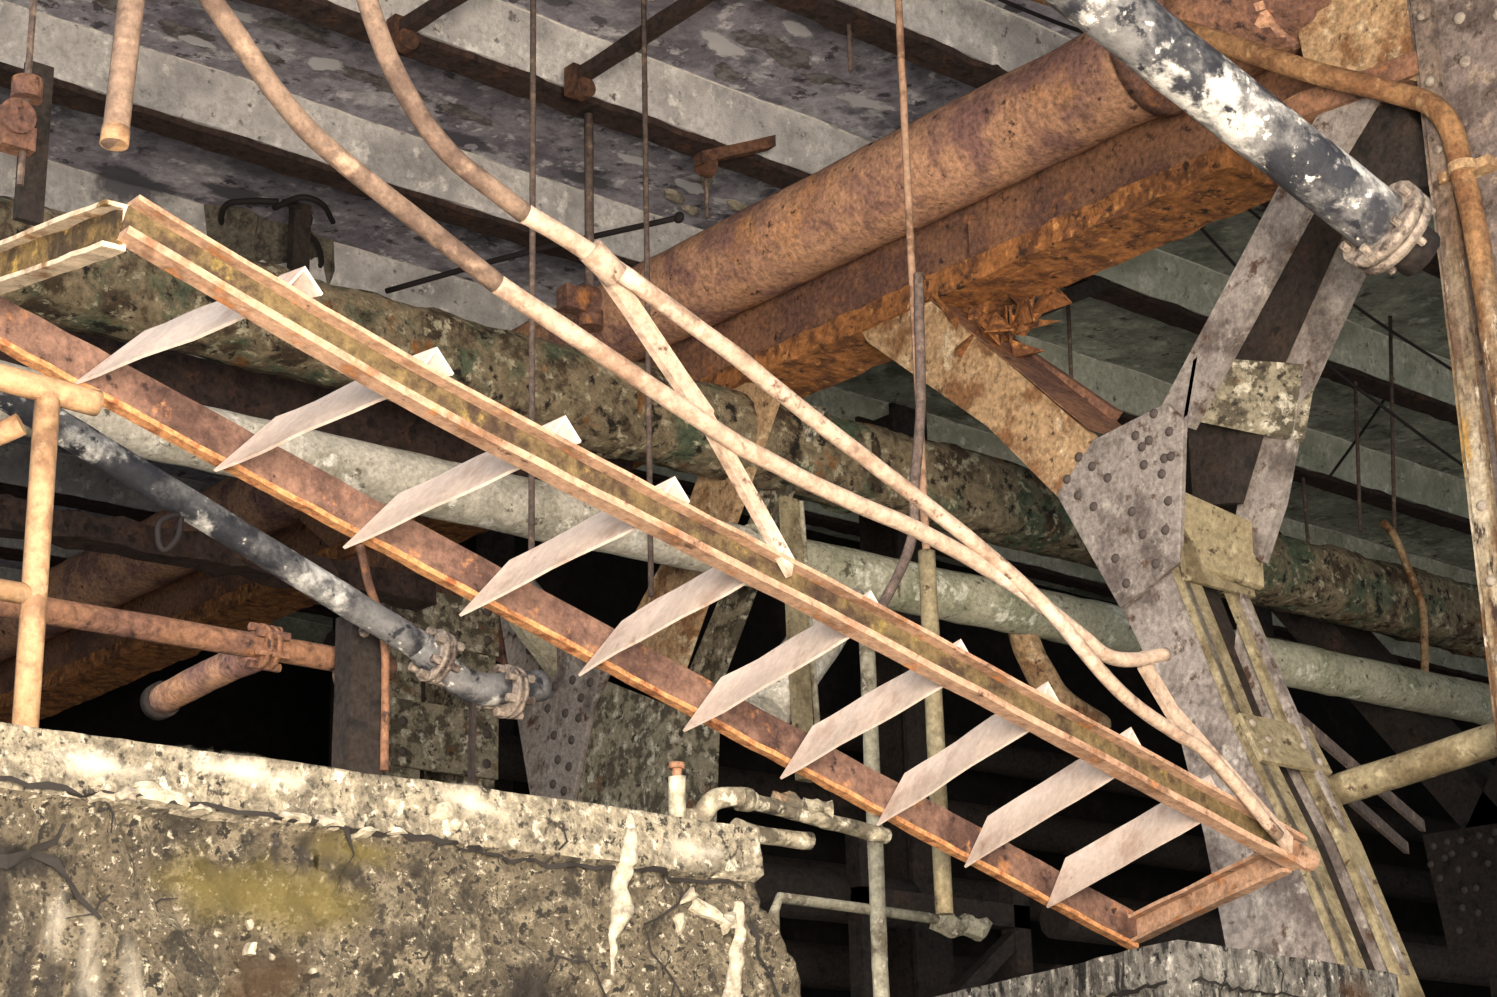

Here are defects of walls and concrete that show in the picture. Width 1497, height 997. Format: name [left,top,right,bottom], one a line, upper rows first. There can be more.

leakage [271,839,280,861]
leakage [296,833,370,914]
crack [0,776,780,997]
crack [1105,961,1299,997]